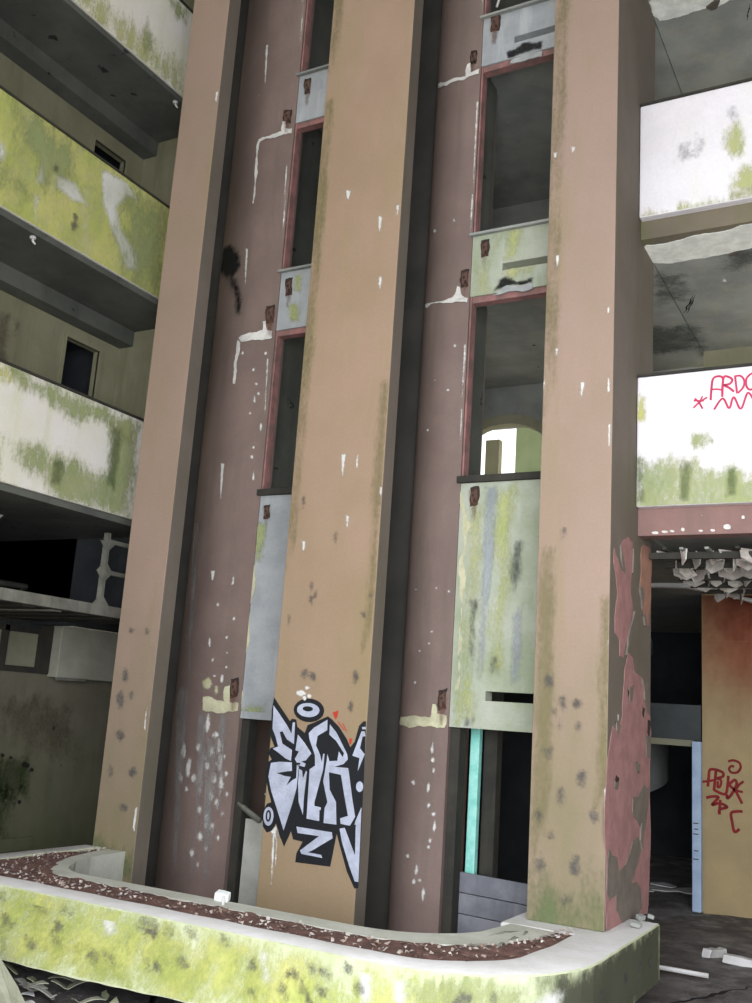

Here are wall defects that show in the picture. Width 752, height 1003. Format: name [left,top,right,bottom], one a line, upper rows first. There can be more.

peeling [649,0,729,21]
water stain [56,175,86,203]
water stain [102,171,137,269]
water stain [53,462,63,483]
water stain [108,429,120,488]
peeling [604,537,652,930]
water stain [360,972,370,1002]
water stain [538,994,559,1003]
crack [670,987,748,1003]